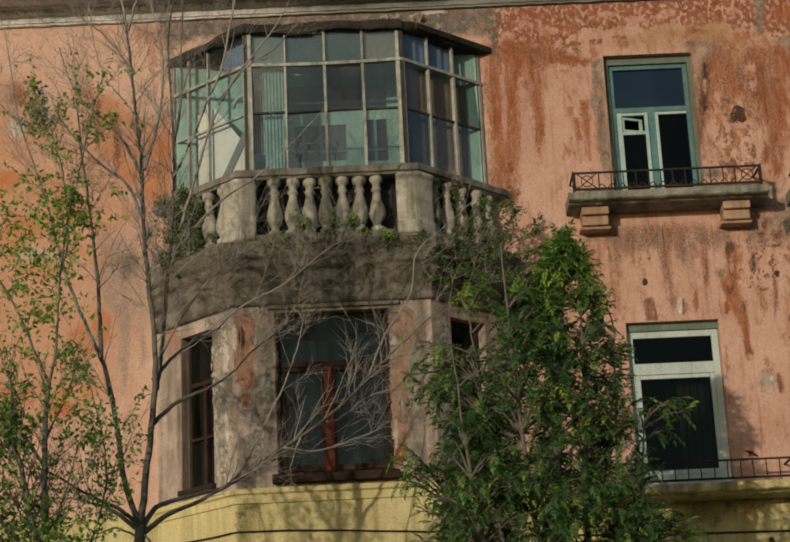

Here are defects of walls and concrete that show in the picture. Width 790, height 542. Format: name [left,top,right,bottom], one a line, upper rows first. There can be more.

water stain [588,57,617,181]
water stain [580,220,736,300]
peeling [209,312,273,481]
peeling [387,309,423,469]